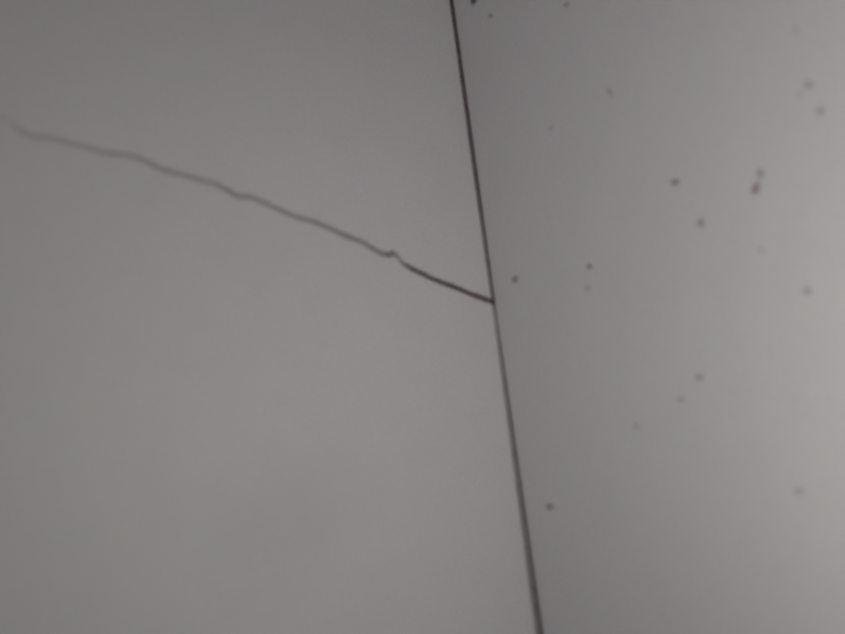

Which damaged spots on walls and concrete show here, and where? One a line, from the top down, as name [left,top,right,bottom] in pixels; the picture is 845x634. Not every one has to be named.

crack [408,266,494,303]